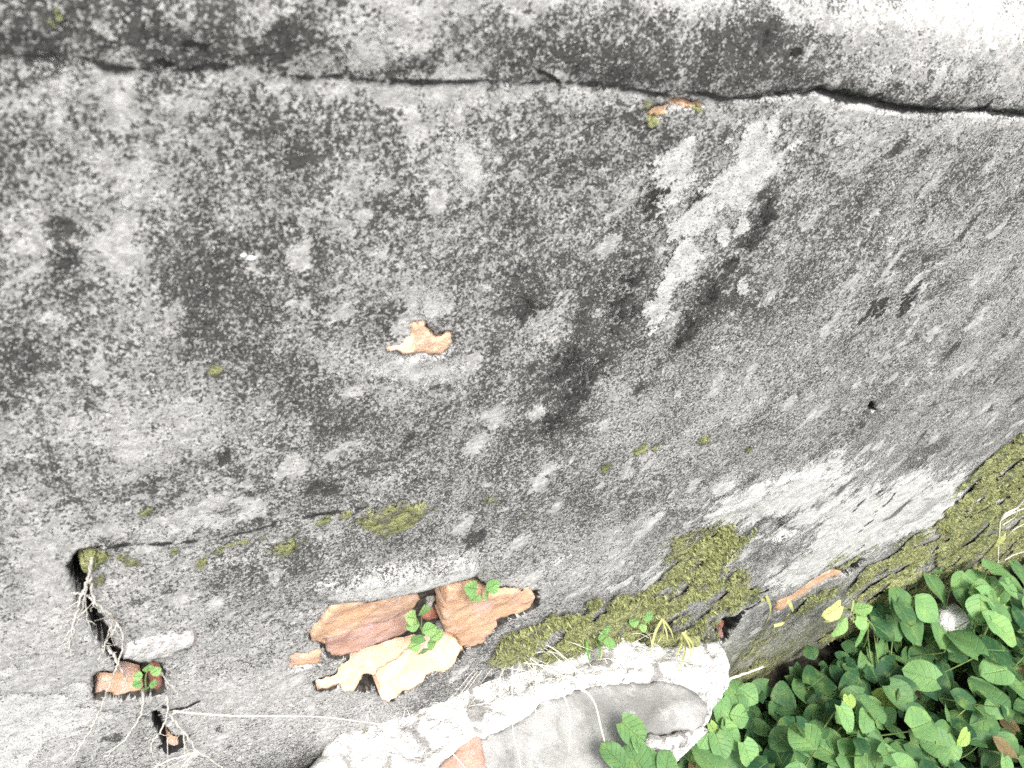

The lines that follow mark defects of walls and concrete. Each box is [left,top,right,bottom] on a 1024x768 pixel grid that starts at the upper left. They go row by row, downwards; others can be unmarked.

crack [0,40,1024,117]
crack [304,505,369,519]
crack [65,526,266,660]